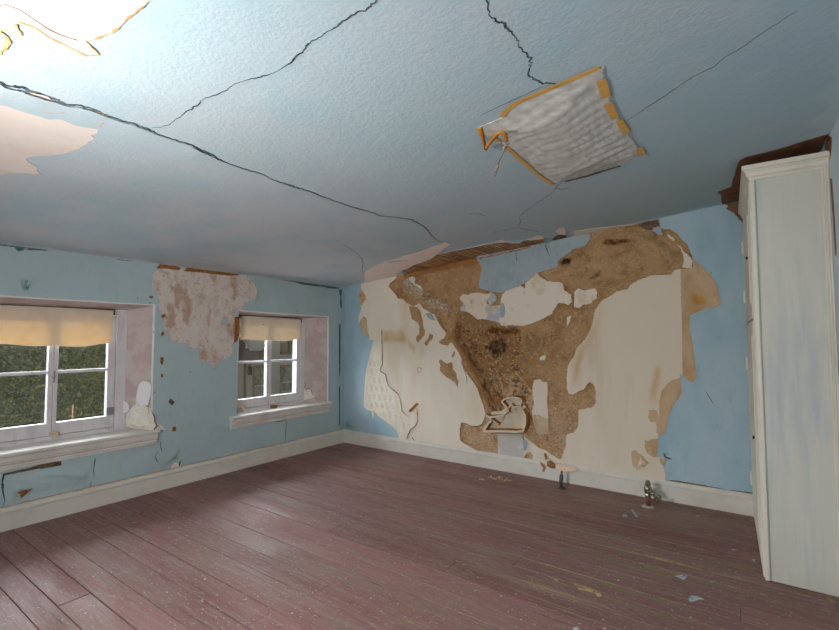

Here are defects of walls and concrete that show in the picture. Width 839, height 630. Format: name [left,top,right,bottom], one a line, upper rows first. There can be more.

peeling [0,0,150,57]
crack [486,0,556,85]
crack [630,11,797,119]
peeling [0,93,108,175]
crack [0,0,444,248]
peeling [149,264,257,368]
flaking render [363,219,693,472]